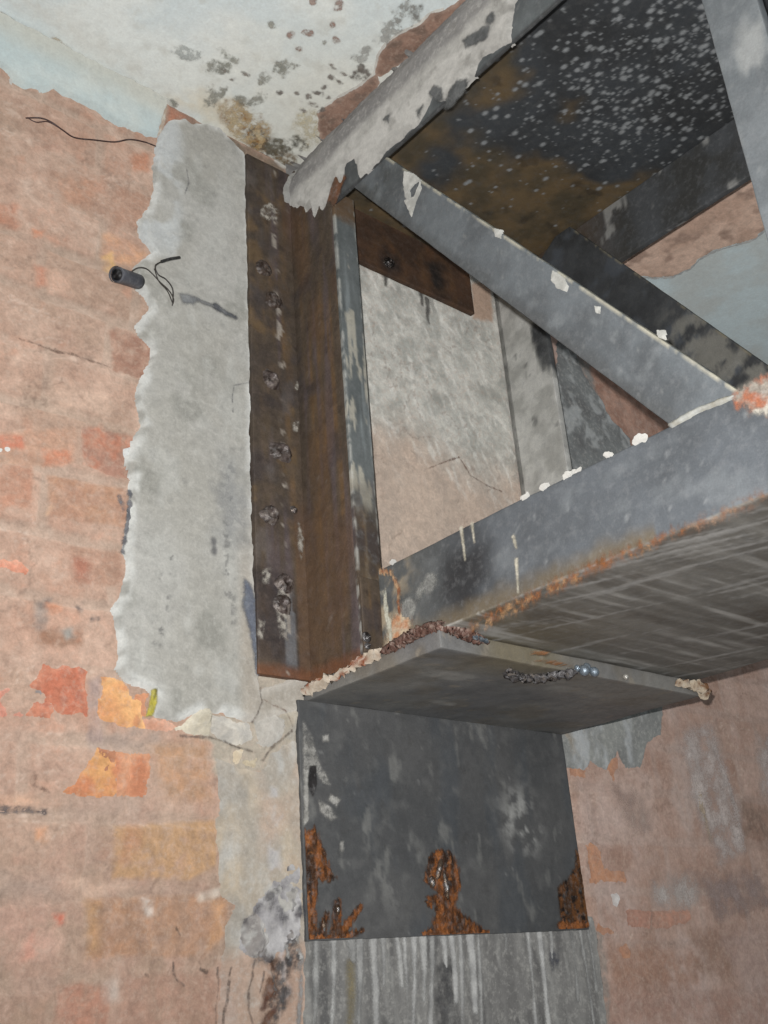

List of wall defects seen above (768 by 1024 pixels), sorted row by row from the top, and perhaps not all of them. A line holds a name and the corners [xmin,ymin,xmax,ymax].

spalling [277,0,466,141]
water stain [221,100,296,165]
rust [379,568,411,644]
spalling [0,664,298,768]
spalling [63,747,151,798]
rust [261,826,364,1024]
rust [422,850,490,936]
rust [557,849,589,929]